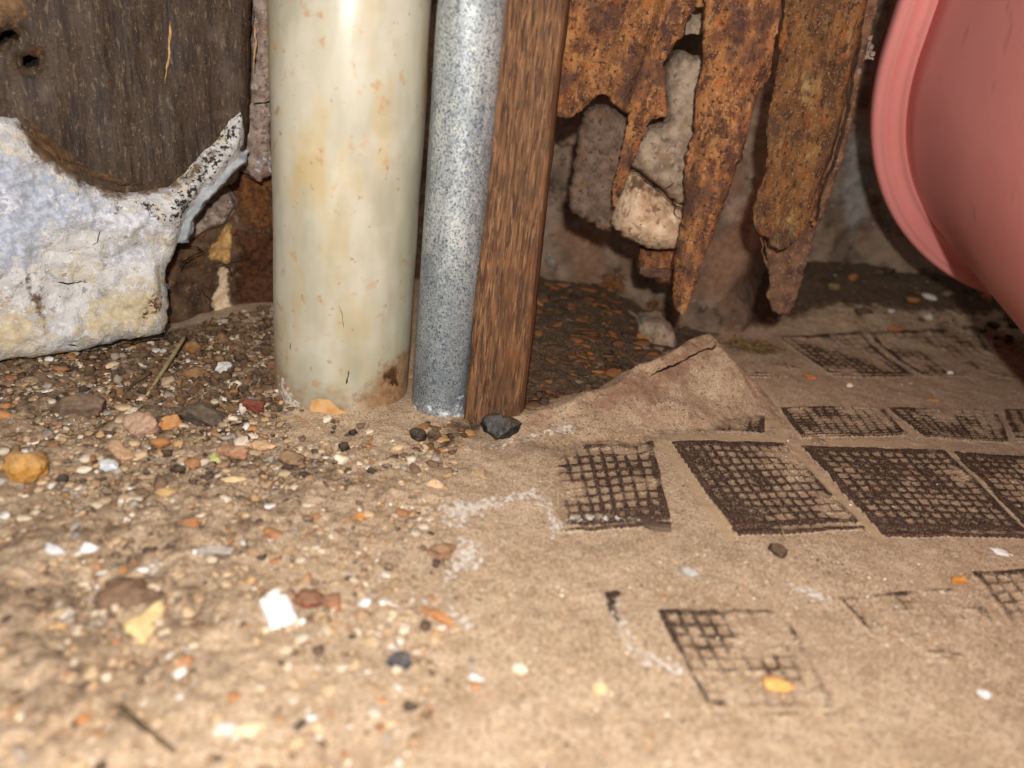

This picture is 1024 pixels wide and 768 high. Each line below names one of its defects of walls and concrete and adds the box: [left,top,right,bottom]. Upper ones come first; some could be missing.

crack [649,345,716,377]
rust [361,367,407,409]
efflorescence [437,488,640,637]